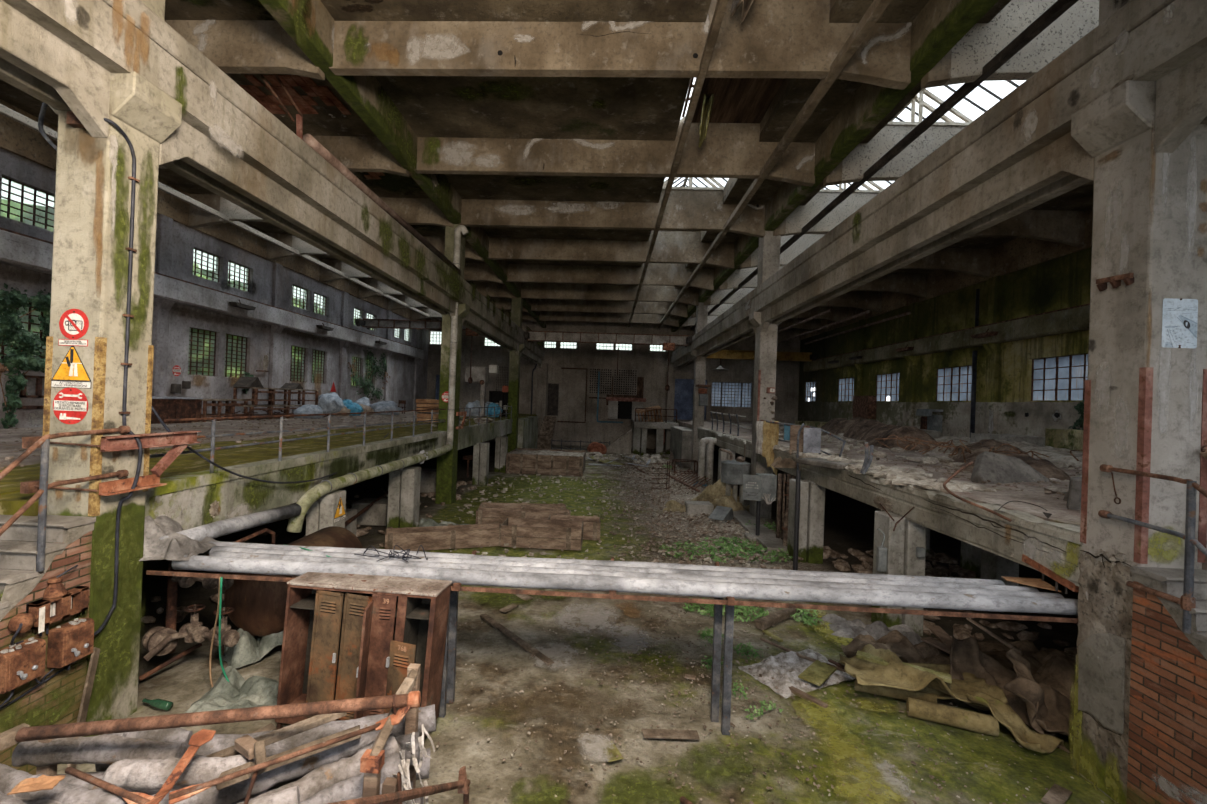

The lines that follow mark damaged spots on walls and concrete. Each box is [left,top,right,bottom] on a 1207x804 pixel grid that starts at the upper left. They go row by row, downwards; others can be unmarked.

rust [113,0,149,73]
spalling [260,74,303,140]
damp [69,128,154,350]
damp [282,328,320,341]